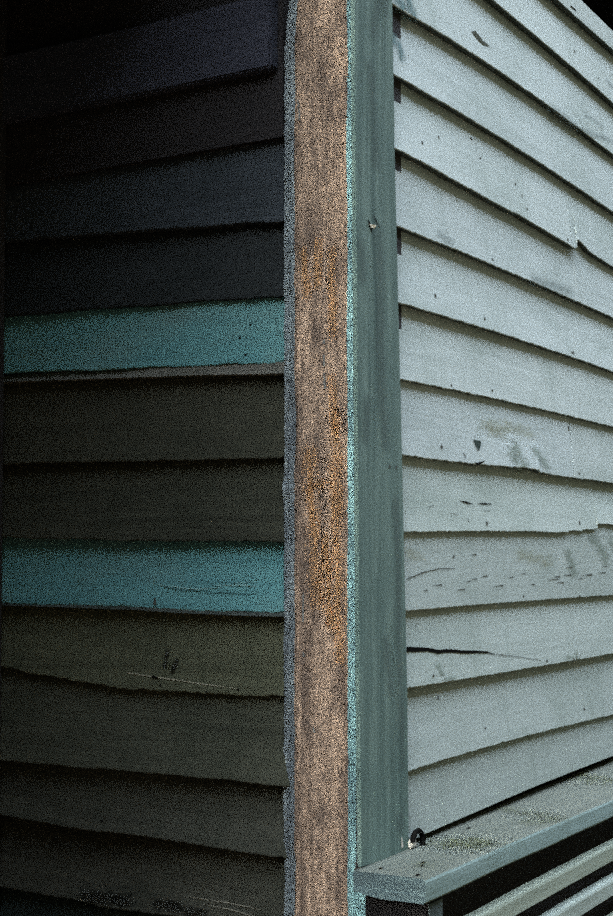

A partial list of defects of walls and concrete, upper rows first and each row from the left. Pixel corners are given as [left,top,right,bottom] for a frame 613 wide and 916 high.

crack [407,643,541,661]